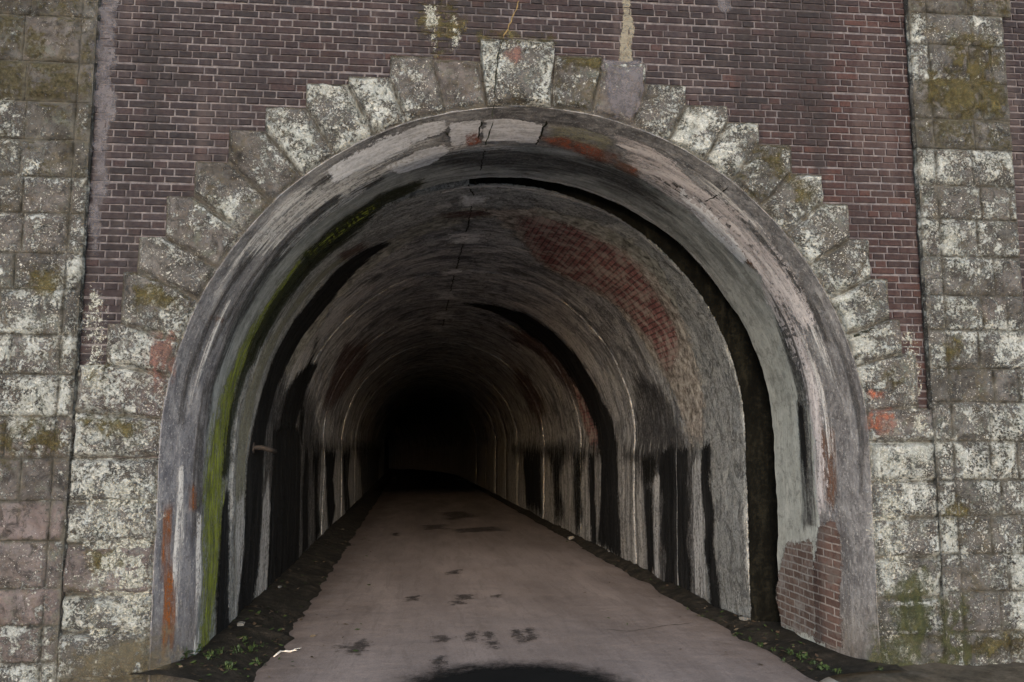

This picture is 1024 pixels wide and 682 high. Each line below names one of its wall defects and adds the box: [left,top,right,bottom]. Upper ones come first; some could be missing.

rust [162,509,175,648]
crack [430,1,519,333]
leakage [173,138,864,635]
spalling [285,119,844,651]